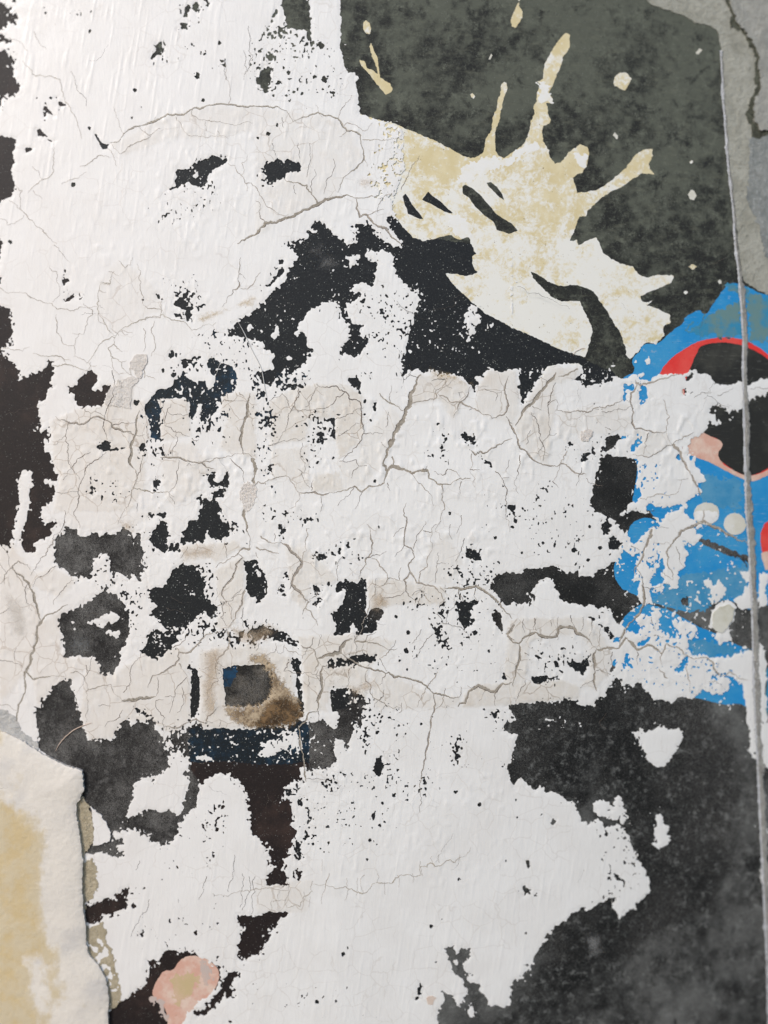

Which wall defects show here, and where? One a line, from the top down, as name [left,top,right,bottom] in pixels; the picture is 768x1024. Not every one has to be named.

crack [725,0,768,139]
peeling [0,306,440,1024]
crack [0,26,747,812]
peeling [67,0,768,541]
peeling [420,716,469,768]
peeling [310,429,768,695]
peeling [435,663,768,1024]